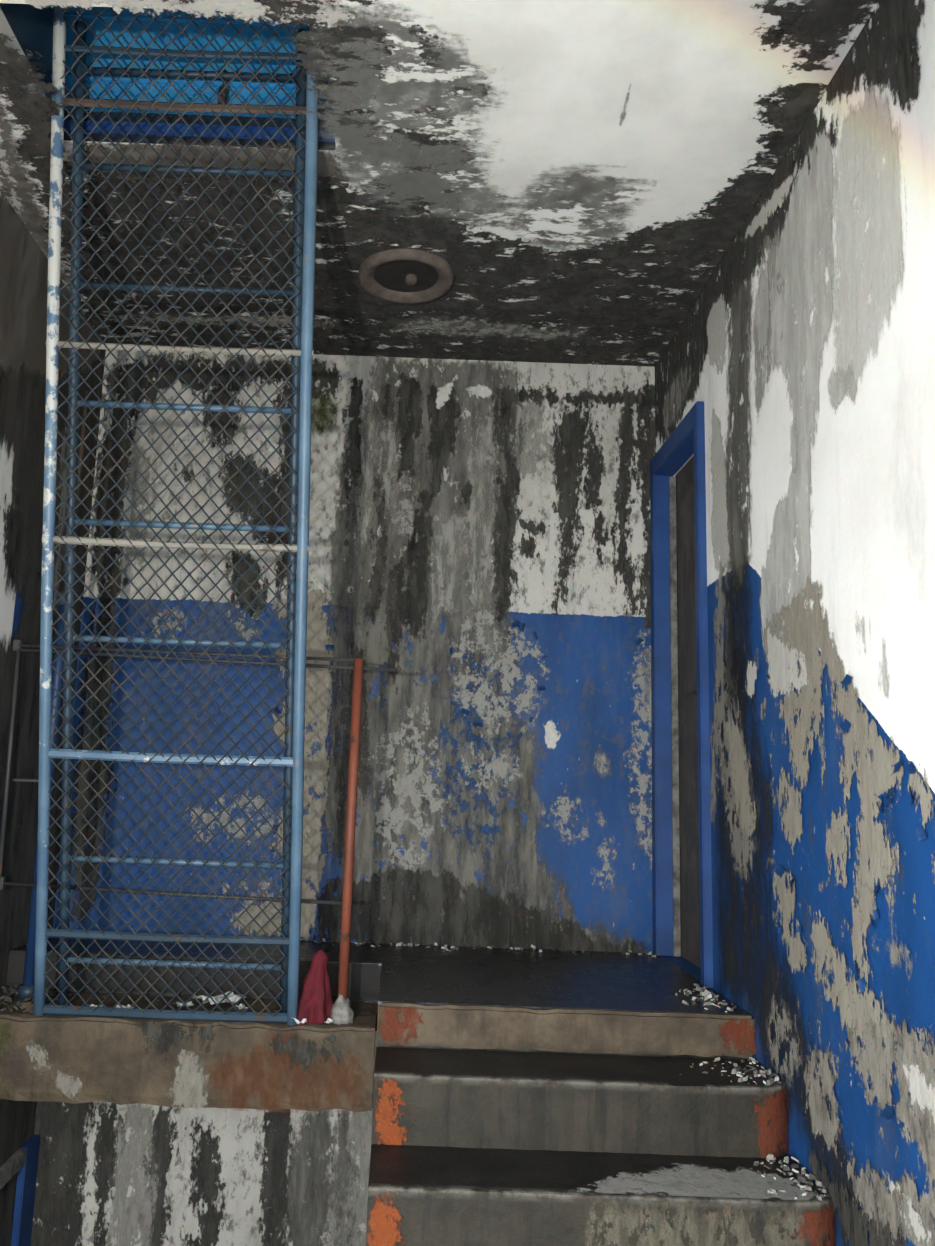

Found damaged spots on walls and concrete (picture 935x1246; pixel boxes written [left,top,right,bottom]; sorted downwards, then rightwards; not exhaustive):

leakage [0,33,295,994]
leakage [287,0,925,953]
peeling [448,605,561,803]
peeling [526,785,617,887]
peeling [594,754,610,775]
peeling [624,628,652,869]
peeling [709,564,935,1246]
leakage [0,1021,228,1246]
leakage [251,1109,372,1246]